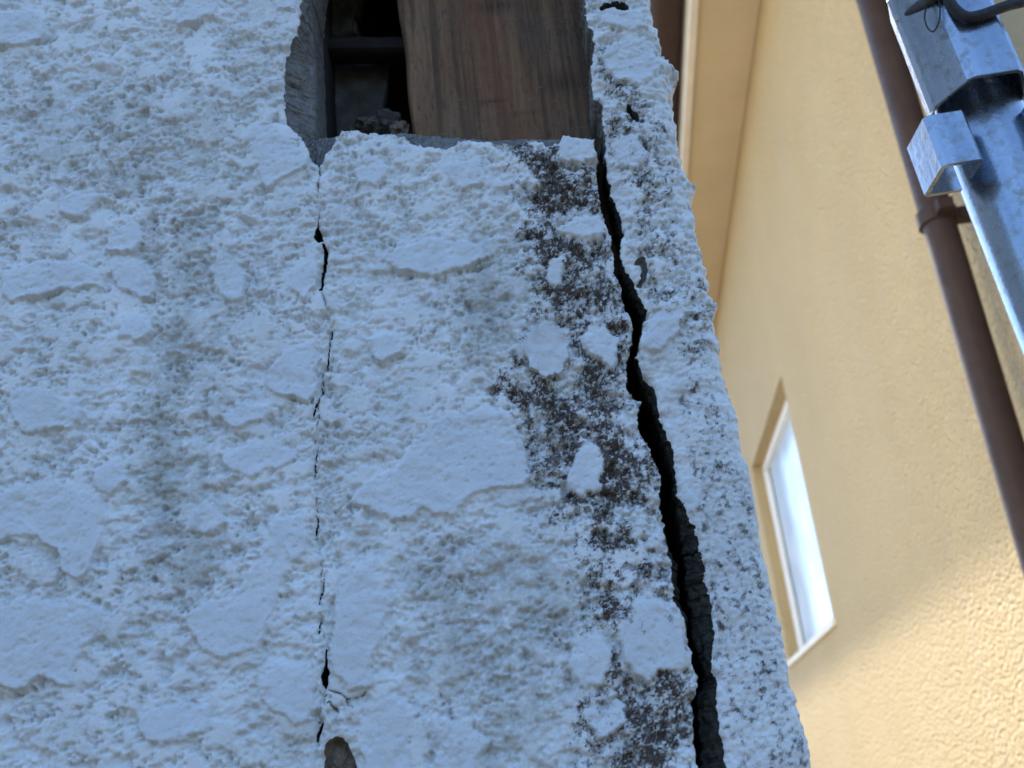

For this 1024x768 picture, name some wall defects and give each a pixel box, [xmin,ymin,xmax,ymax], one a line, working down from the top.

spalling [284,0,336,167]
crack [314,217,328,303]
spalling [379,133,563,150]
spalling [579,0,606,190]
water stain [598,48,707,312]
water stain [678,310,714,366]
crack [313,332,365,746]
water stain [490,141,695,768]
crack [595,161,727,768]